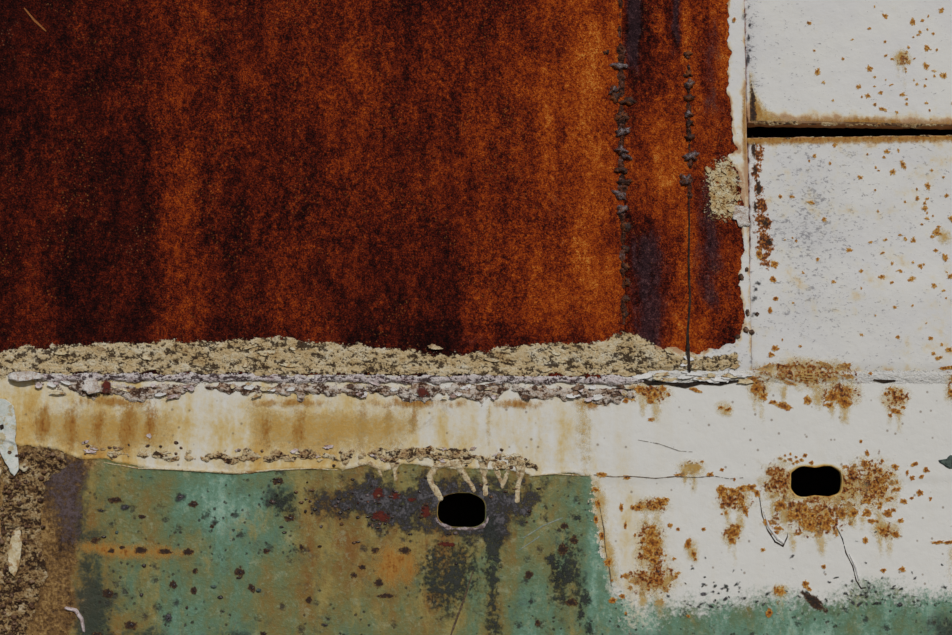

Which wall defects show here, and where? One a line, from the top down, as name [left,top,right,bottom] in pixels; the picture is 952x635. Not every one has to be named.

corrosion [884,8,947,88]
peeling [703,156,751,227]
peeling [0,398,29,476]
peeling [82,434,592,476]
peeling [0,332,754,408]
corrosion [623,385,671,421]
corrosion [748,338,873,420]
corrosion [882,386,909,420]
corrosion [929,336,952,399]
corrosion [674,440,932,551]
corrosion [545,515,592,633]
corrosion [591,472,697,607]